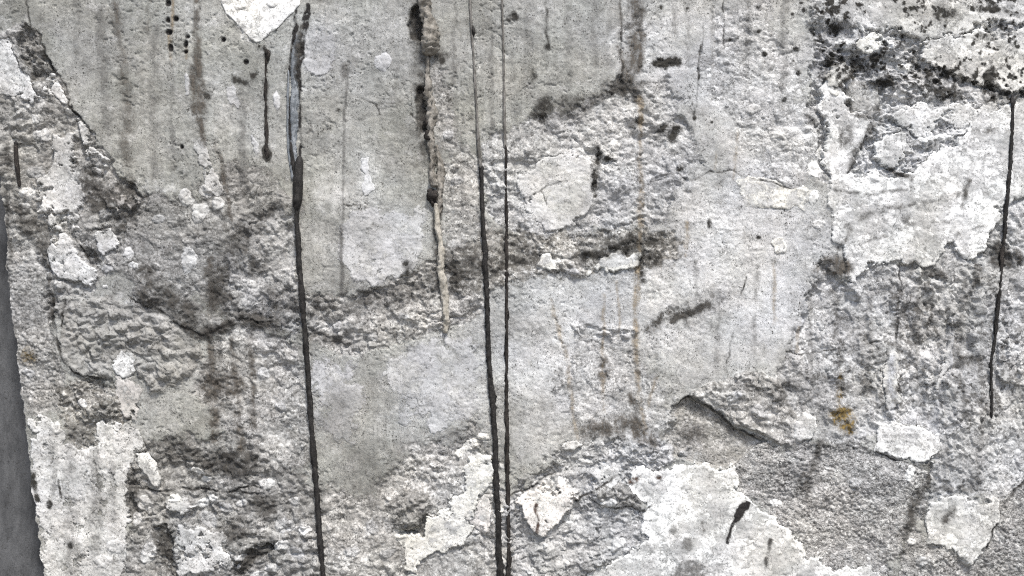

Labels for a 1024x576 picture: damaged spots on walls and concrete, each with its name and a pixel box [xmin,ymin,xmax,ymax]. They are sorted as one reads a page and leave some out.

water stain [410,8,422,39]
water stain [416,87,427,131]
water stain [791,0,1024,171]
spalling [0,0,800,576]
spalling [587,0,1024,576]
crack [671,395,756,439]